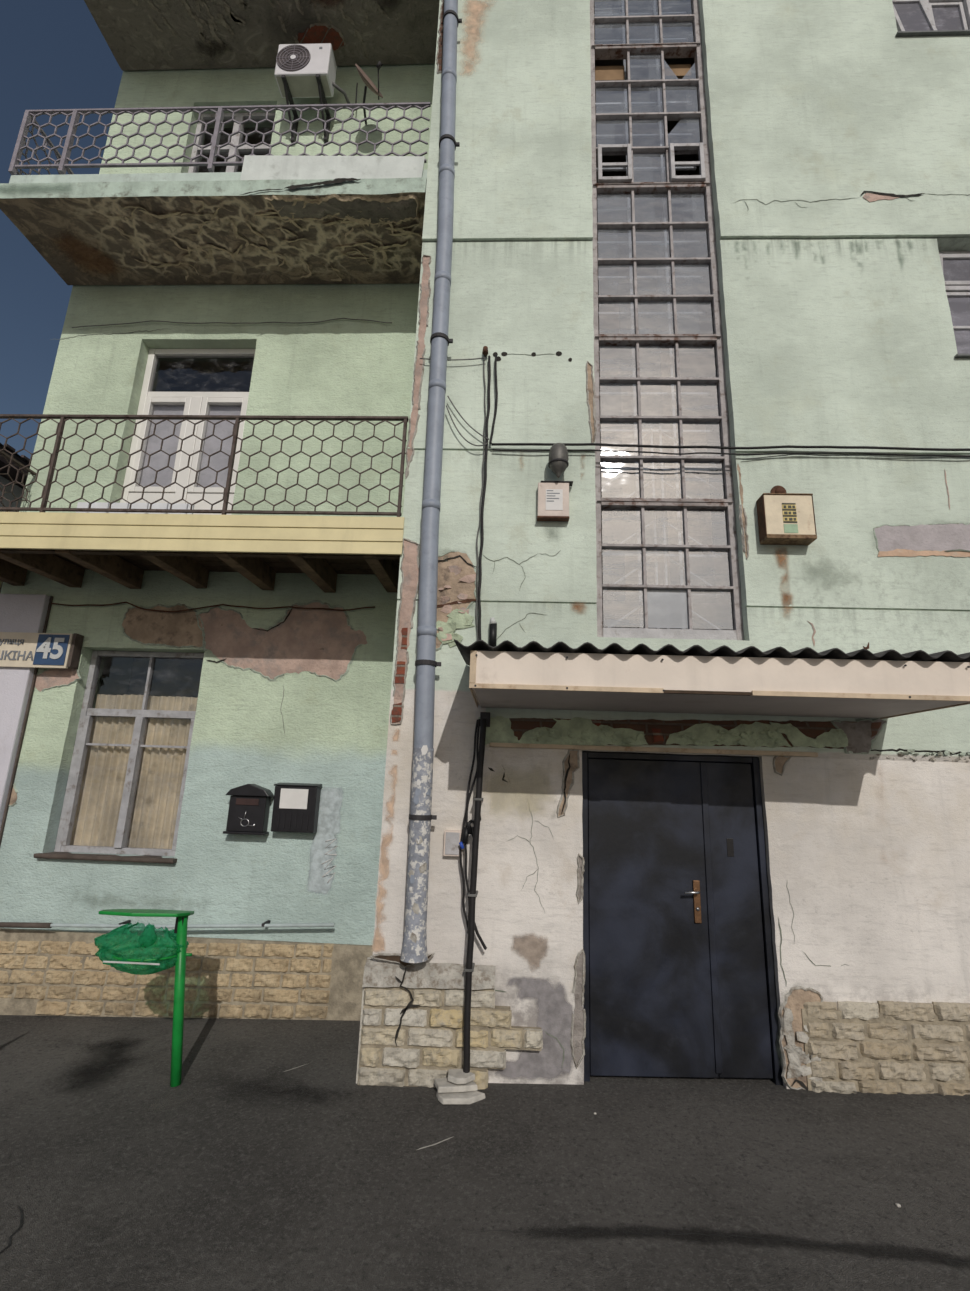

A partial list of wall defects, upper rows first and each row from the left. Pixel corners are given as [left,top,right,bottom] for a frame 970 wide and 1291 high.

crack [731,191,970,211]
peeling [873,522,970,557]
spalling [122,600,367,682]
spalling [390,538,420,726]
spalling [436,550,477,652]
crack [482,550,561,639]
peeling [479,716,970,818]
crack [488,766,554,909]
peeling [513,935,547,967]
crack [395,968,420,1046]
spalling [570,949,586,1069]
spalling [778,986,823,1090]